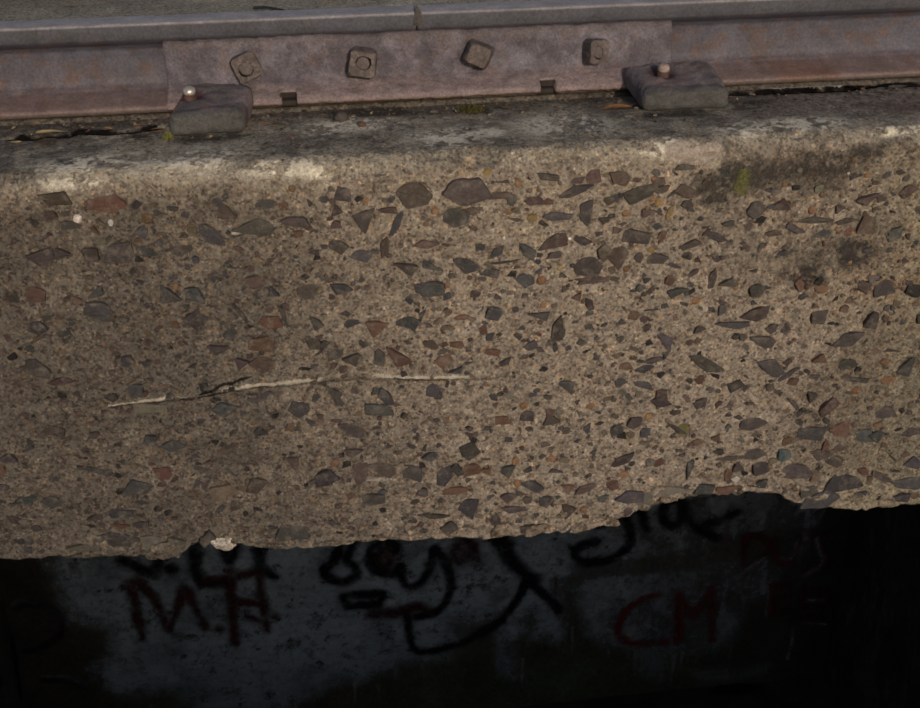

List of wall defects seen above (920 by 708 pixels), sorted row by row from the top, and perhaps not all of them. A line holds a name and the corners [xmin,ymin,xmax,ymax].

crack [108,376,338,406]
crack [371,373,472,381]